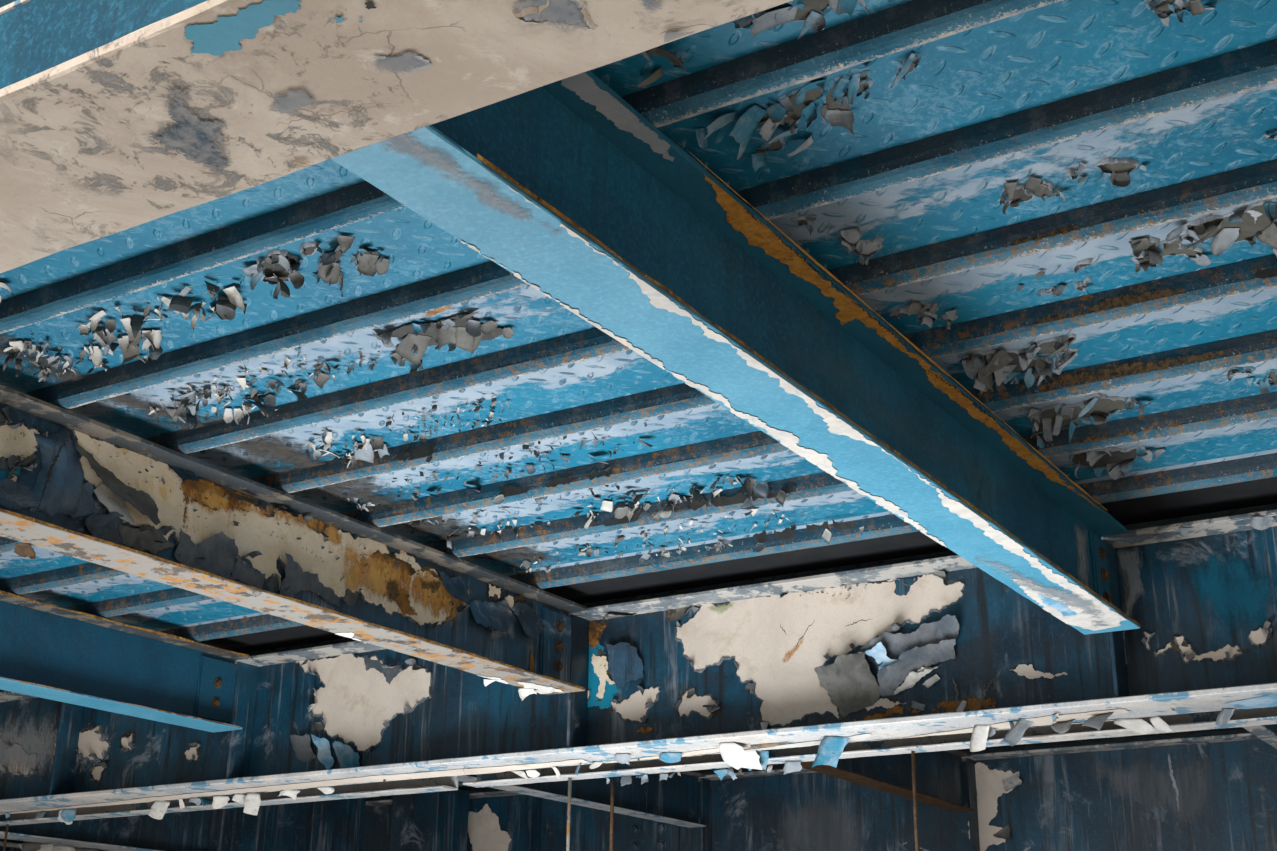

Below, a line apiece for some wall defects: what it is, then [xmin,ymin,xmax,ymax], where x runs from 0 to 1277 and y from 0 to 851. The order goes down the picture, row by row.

peeling [695,66,873,172]
peeling [3,235,390,382]
peeling [148,306,514,429]
peeling [455,237,946,547]
rust [477,136,1141,626]
peeling [560,224,1126,631]
rust [1025,287,1192,327]
rust [1038,338,1277,393]
rust [0,478,584,689]
peeling [69,429,563,700]
peeling [0,570,1176,851]
peeling [1141,621,1272,664]